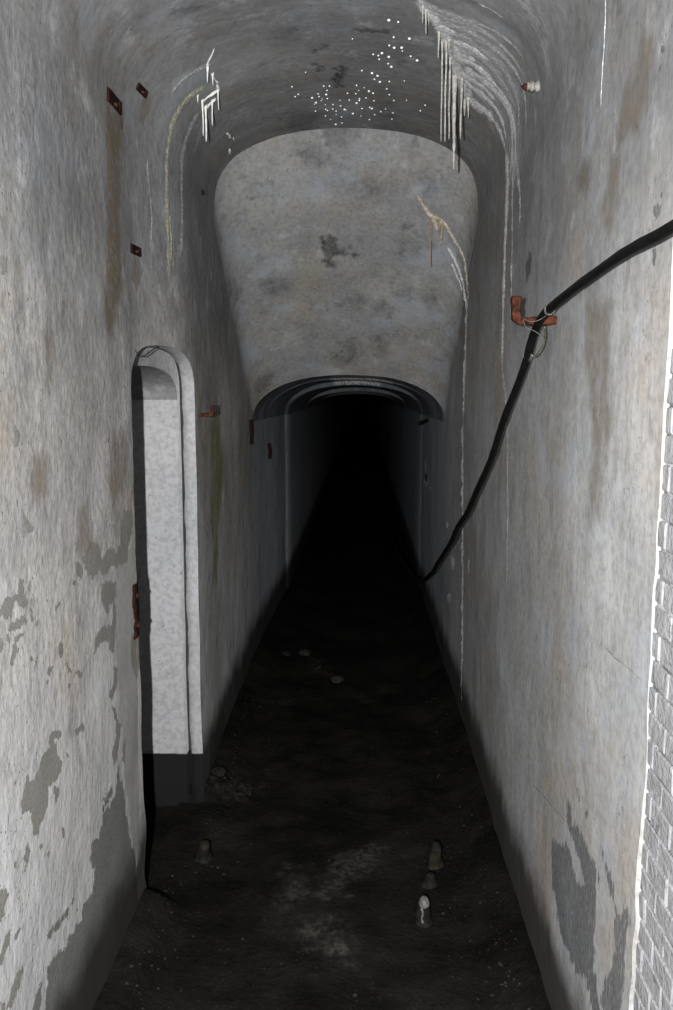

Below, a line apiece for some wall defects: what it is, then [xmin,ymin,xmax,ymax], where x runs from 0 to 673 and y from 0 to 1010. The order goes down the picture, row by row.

damp [166,49,220,272]
damp [424,6,526,367]
damp [417,195,468,404]
flaking render [0,578,38,667]
flaking render [46,641,82,688]
flaking render [71,509,133,654]
flaking render [0,886,22,965]
flaking render [0,965,23,1010]
flaking render [14,729,69,873]
flaking render [33,666,138,1010]
flaking render [551,797,630,1010]